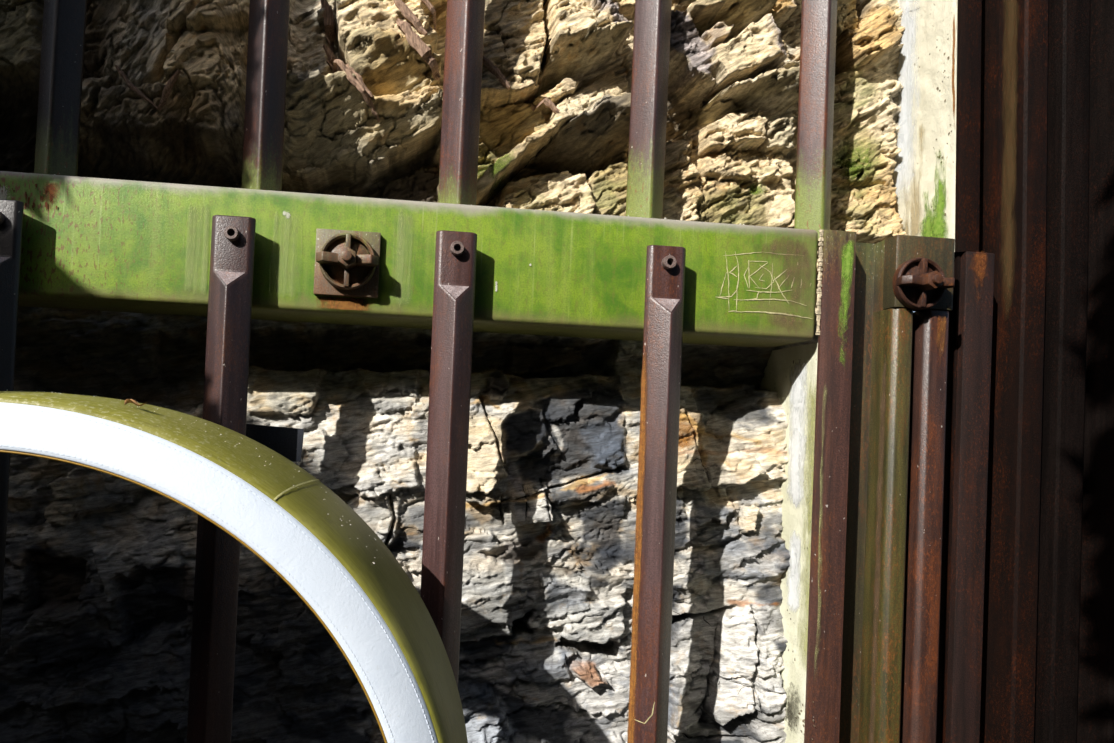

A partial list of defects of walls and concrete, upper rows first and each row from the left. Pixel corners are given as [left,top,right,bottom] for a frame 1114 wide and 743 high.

corrosion [974,252,986,279]
corrosion [1002,0,1017,302]